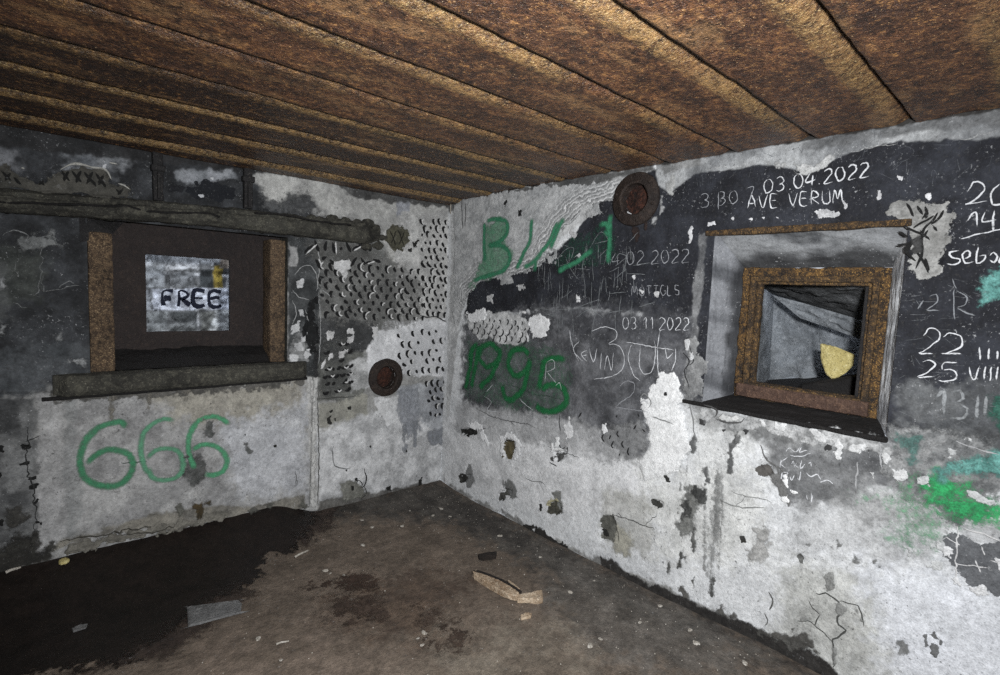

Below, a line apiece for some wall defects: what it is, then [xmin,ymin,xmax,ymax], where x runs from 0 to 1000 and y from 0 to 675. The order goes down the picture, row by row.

spalling [461,421,522,460]
spalling [539,491,563,515]
spalling [600,336,1000,597]
water stain [0,506,339,675]
crack [800,572,864,668]